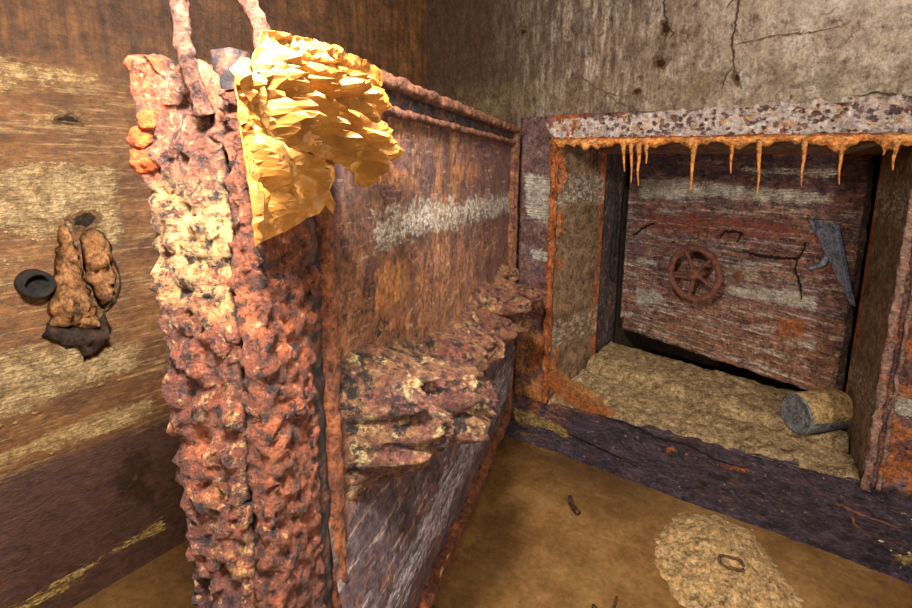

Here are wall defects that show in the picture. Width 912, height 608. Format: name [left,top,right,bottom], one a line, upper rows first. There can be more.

crack [723,0,845,89]
corrosion [550,133,912,195]
leakage [370,193,510,251]
crack [720,230,806,299]